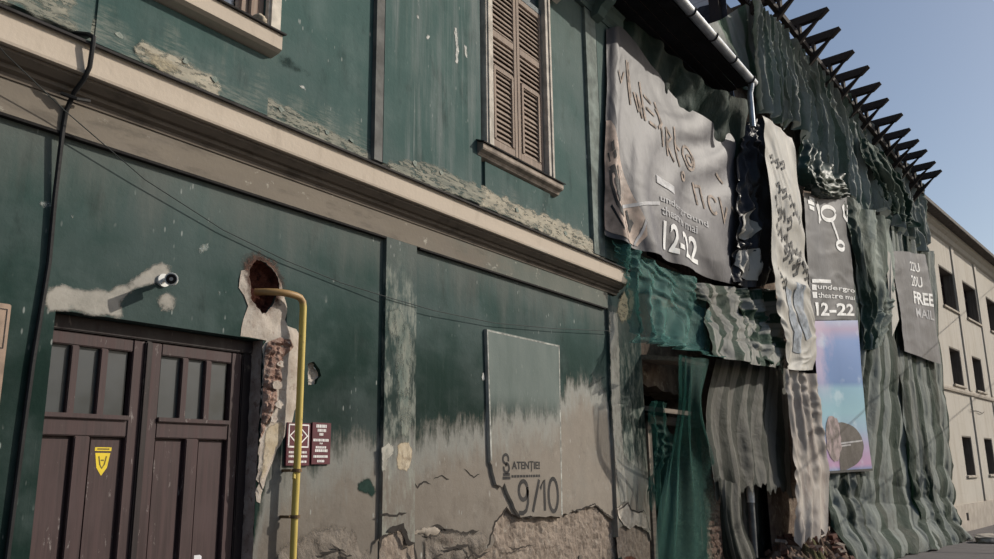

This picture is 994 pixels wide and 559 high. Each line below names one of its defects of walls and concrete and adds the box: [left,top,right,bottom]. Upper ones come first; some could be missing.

peeling [1,0,77,31]
peeling [135,42,221,95]
peeling [235,98,375,162]
peeling [388,160,604,259]
rust [244,255,283,310]
spalling [239,260,318,559]
peeling [382,308,412,471]
spalling [478,293,650,559]
spalling [379,530,415,559]